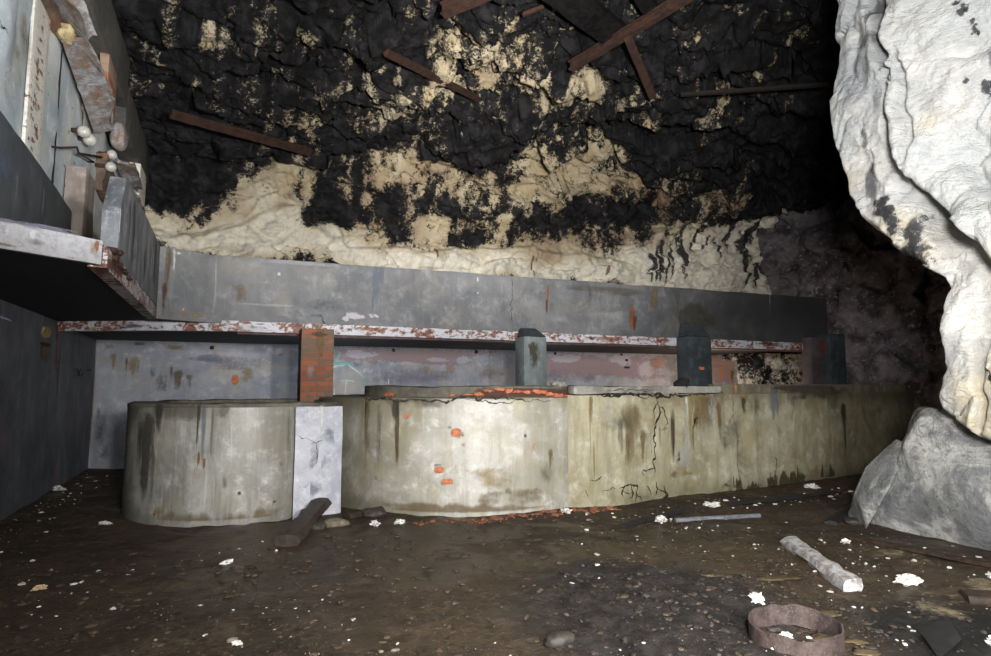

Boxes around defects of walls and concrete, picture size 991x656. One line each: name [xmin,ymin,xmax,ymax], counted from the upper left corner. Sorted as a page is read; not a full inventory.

peeling [334,347,496,379]
peeling [547,352,666,379]
spalling [449,388,576,397]
leakage [137,404,162,494]
crack [585,388,739,501]